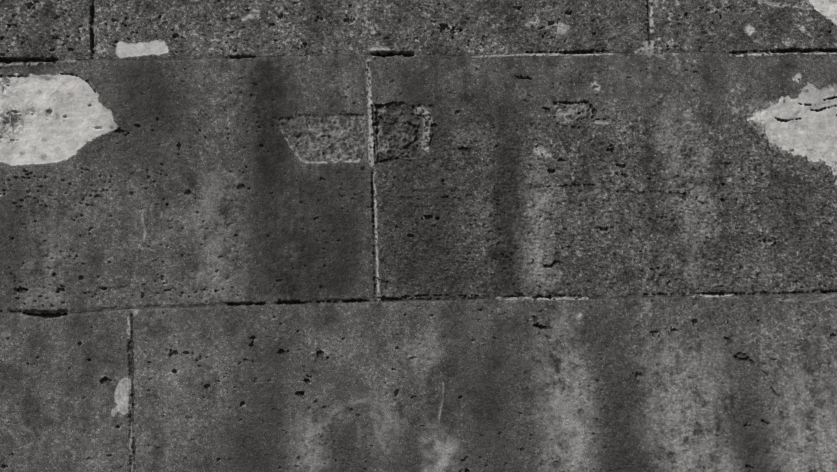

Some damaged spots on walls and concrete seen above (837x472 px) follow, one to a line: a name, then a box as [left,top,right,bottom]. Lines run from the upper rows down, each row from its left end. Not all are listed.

spalling [271,102,436,166]